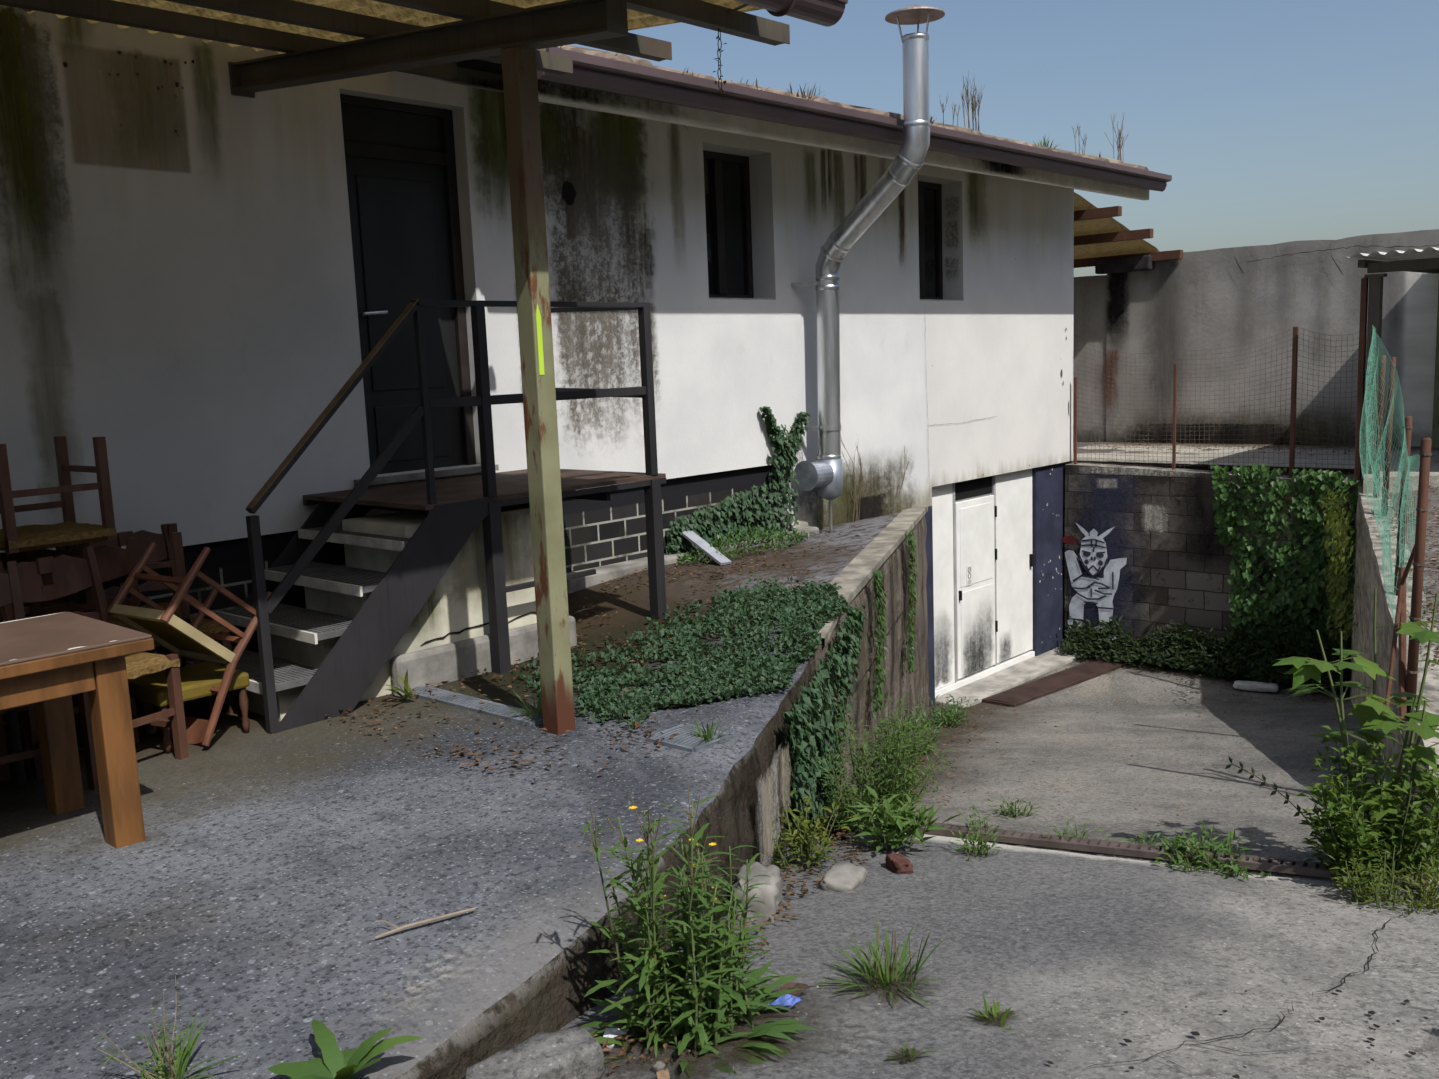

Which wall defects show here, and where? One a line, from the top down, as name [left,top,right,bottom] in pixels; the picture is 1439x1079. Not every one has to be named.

leakage [0,8,68,261]
leakage [472,81,508,174]
leakage [537,80,672,432]
leakage [807,149,866,220]
leakage [946,160,1021,277]
leakage [1107,272,1128,341]
crack [1085,906,1419,1069]